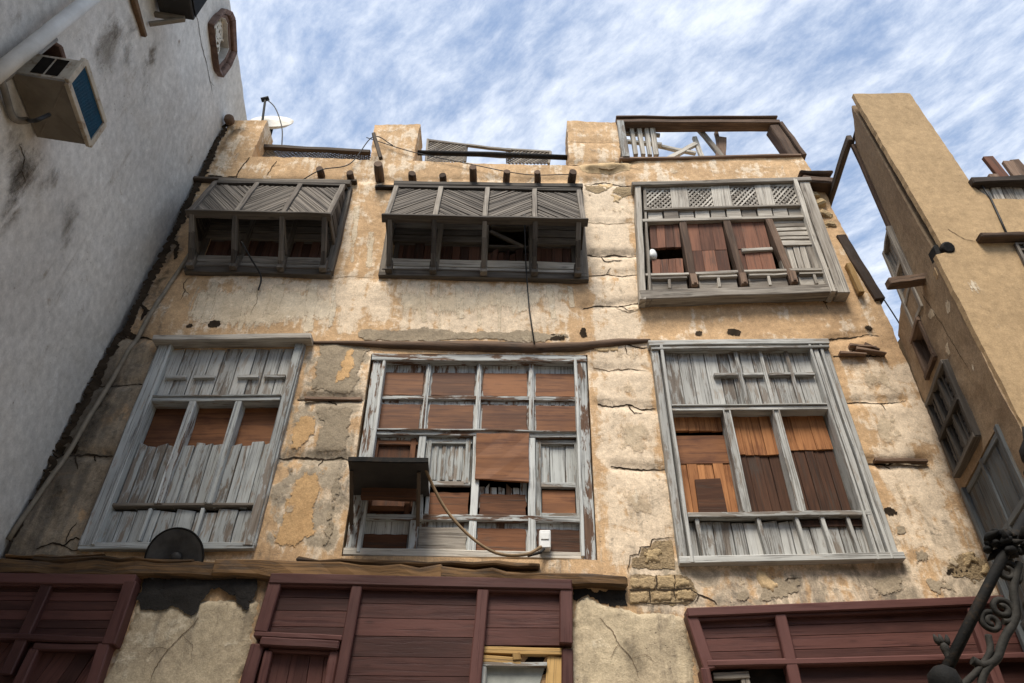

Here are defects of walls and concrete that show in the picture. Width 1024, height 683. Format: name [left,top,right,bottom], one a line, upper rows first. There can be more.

crack [588,254,636,277]
crack [583,303,640,313]
spalling [291,327,568,455]
crack [52,450,112,469]
flaking render [273,467,344,547]
crack [36,523,80,551]
flaking render [573,540,697,610]